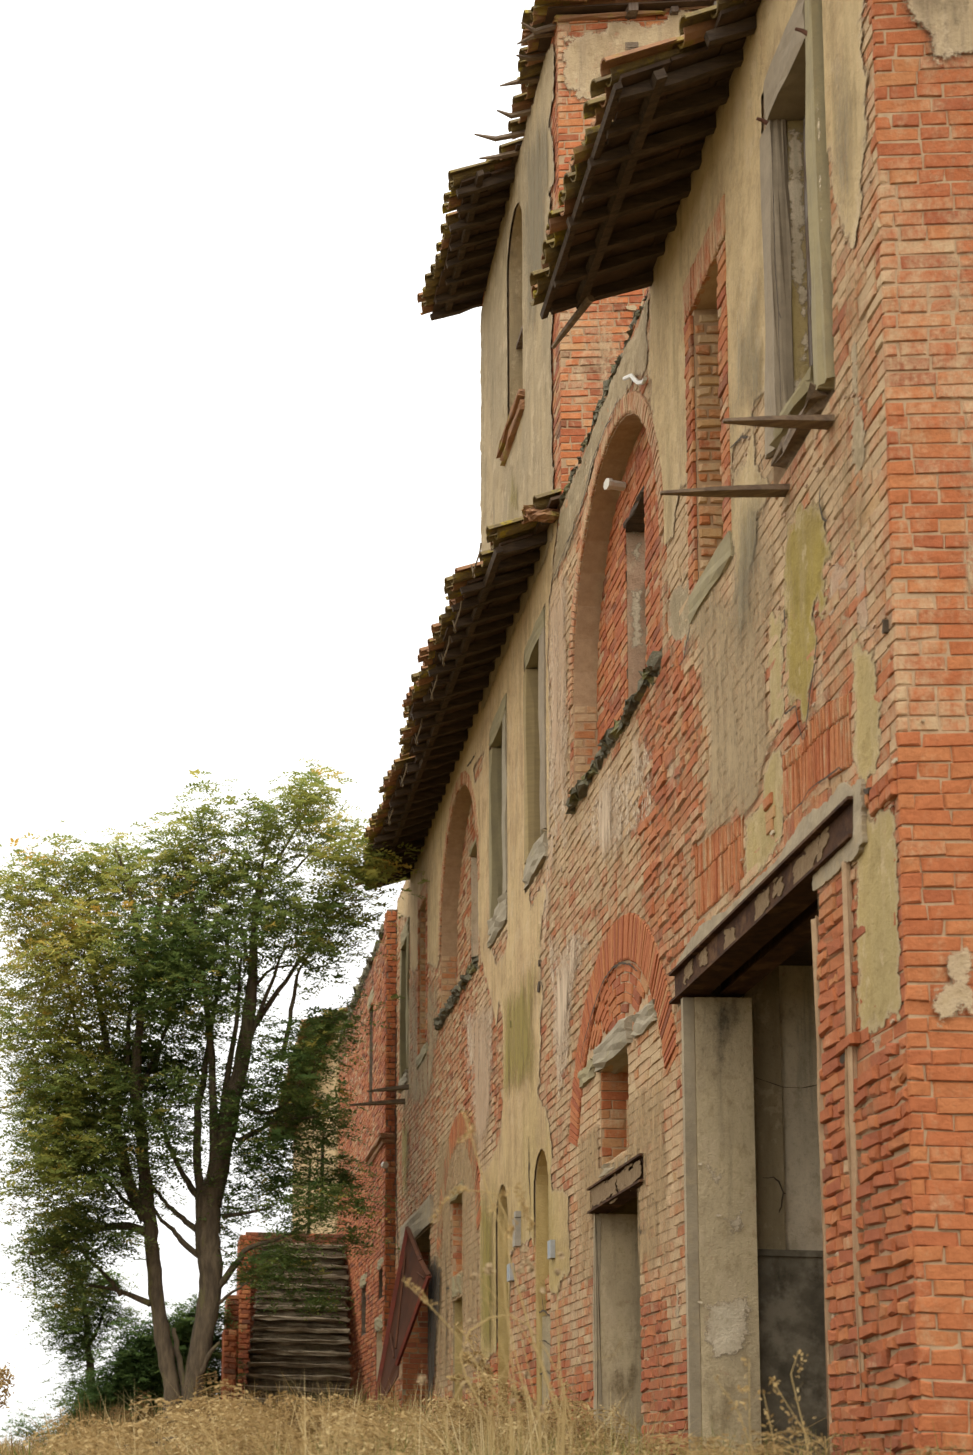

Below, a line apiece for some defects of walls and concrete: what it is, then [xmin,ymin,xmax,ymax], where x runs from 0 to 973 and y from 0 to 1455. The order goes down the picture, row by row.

spalling [480,1240,576,1439]
spalling [530,3,927,1455]